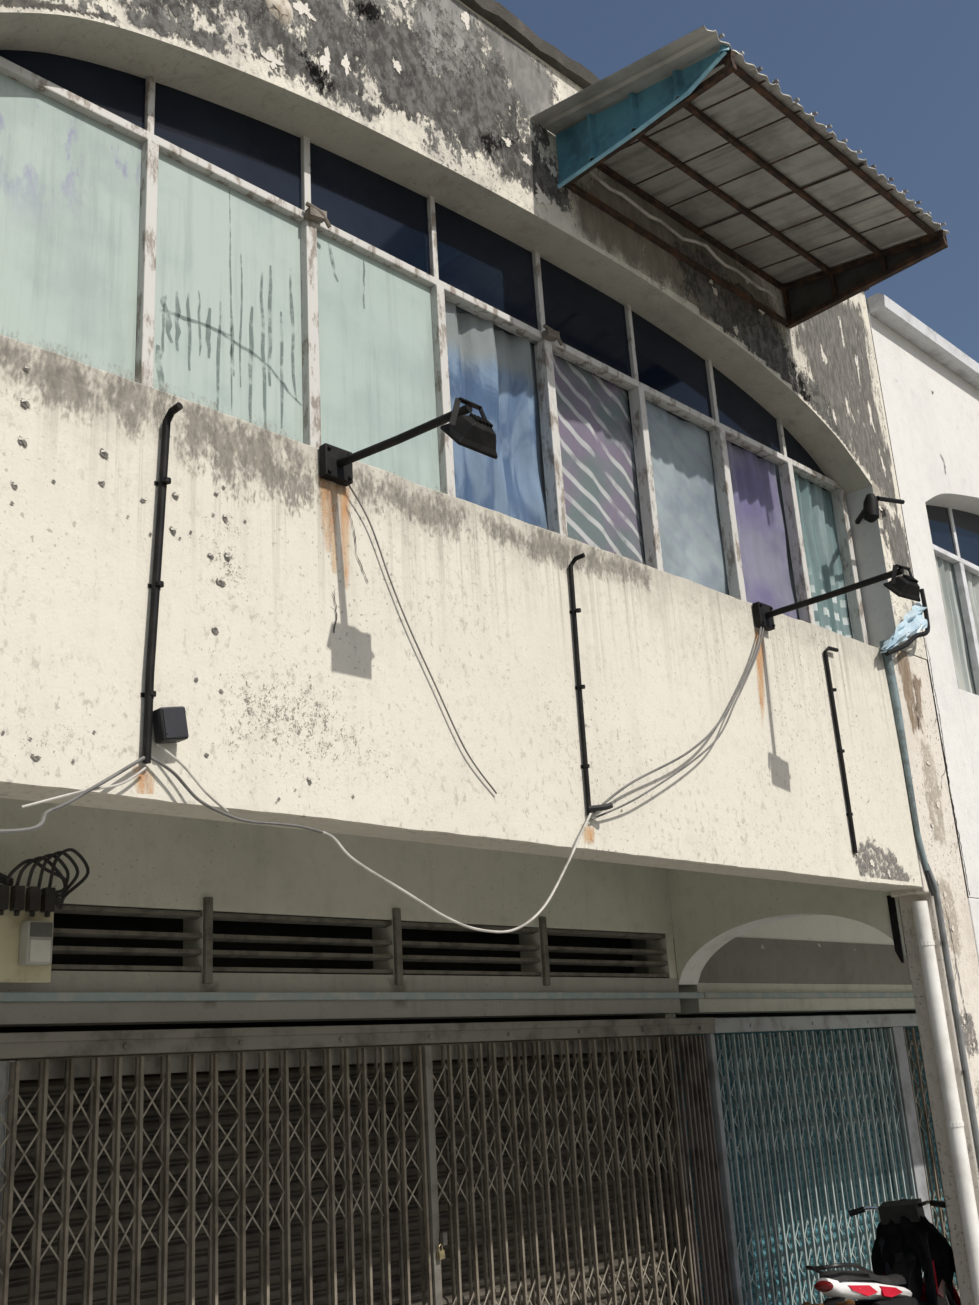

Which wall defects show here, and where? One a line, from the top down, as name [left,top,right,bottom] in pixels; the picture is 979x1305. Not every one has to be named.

water stain [0,0,913,576]
rust [322,481,348,572]
rust [755,632,763,705]